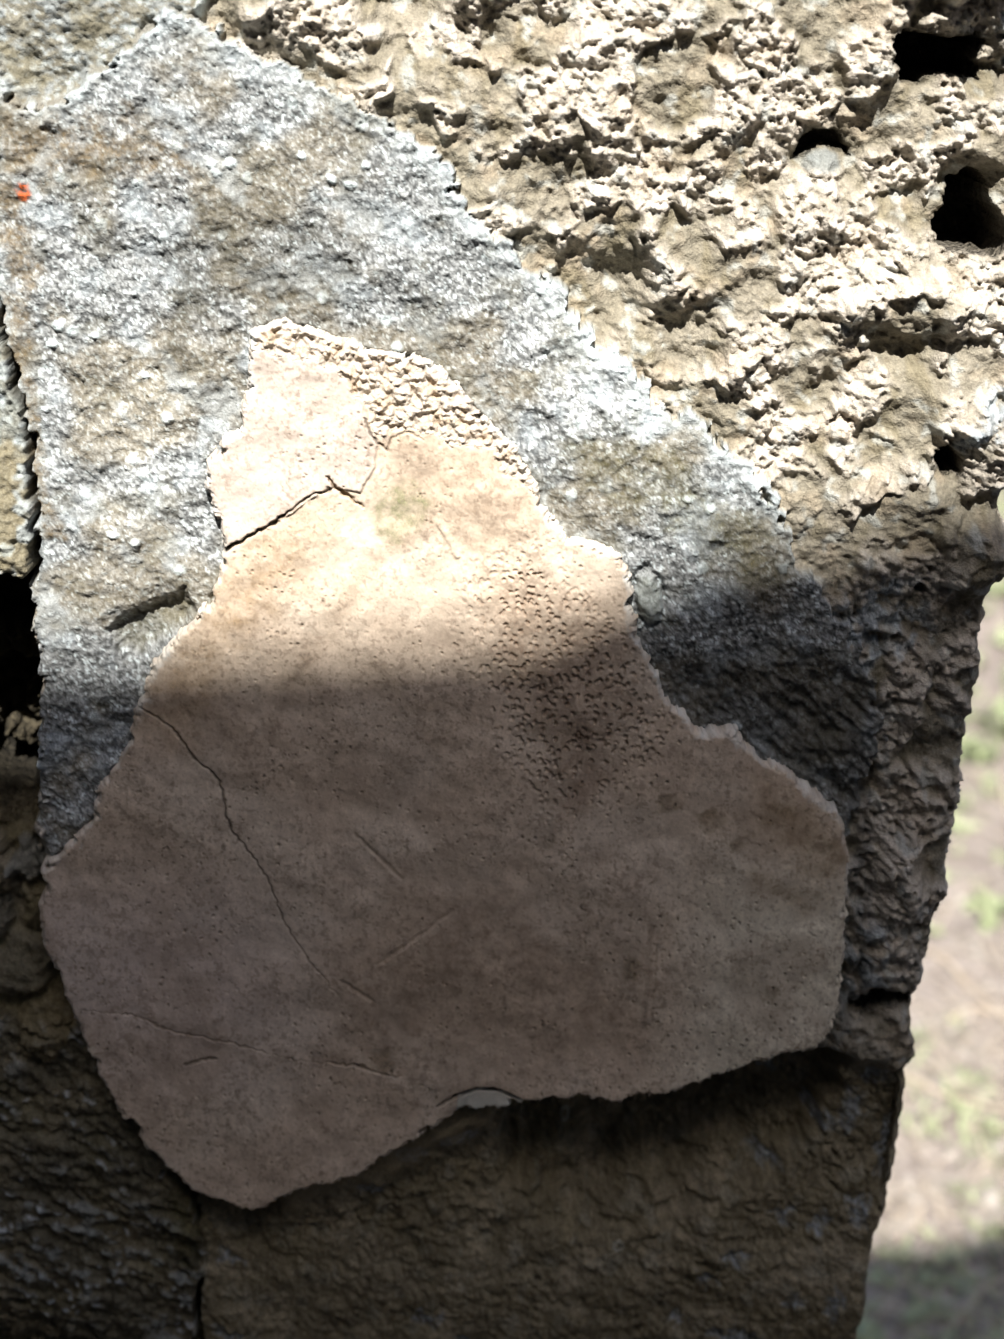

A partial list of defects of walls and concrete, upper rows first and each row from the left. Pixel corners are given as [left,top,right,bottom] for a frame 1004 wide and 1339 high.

crack [0,297,43,584]
crack [223,476,364,554]
spalling [0,567,44,835]
crack [140,707,337,994]
crack [81,1010,402,1079]
crack [160,1169,208,1339]